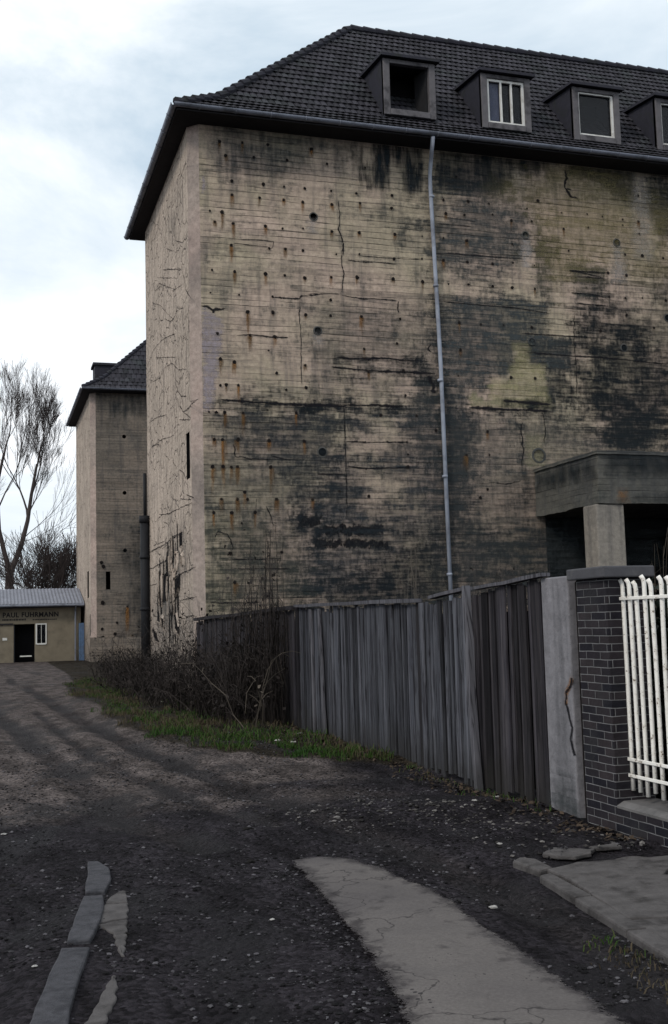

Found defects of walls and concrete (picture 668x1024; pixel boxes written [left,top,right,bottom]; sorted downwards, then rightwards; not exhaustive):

rust [211,438,240,478]
crack [149,151,521,634]
damp [217,127,668,612]
crack [564,170,578,199]